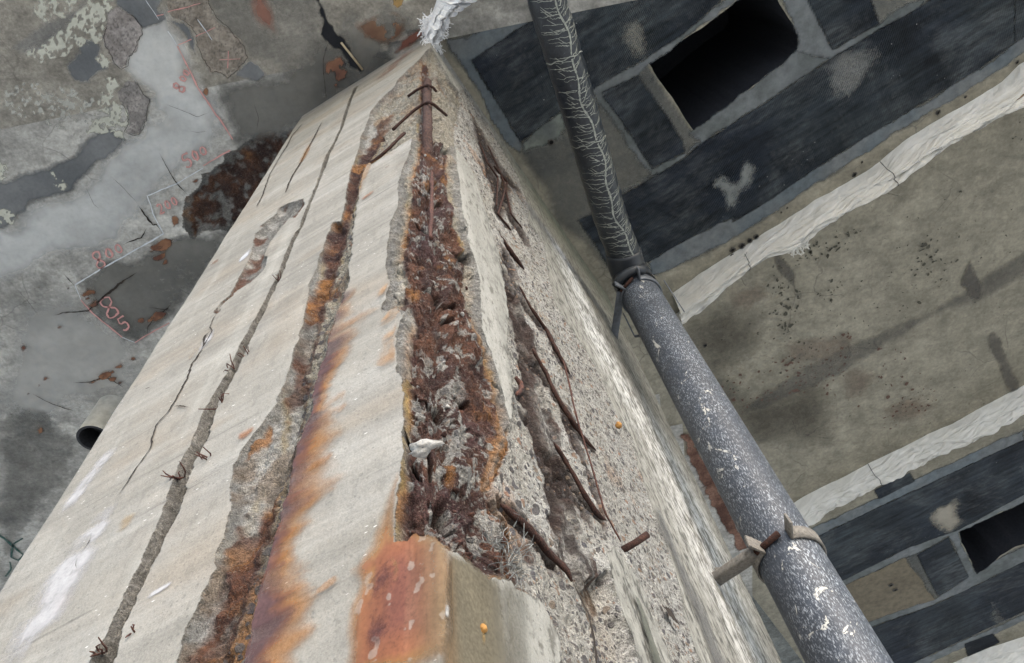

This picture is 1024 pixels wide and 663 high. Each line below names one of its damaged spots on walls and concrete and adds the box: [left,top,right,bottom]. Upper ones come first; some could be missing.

crack [21,274,134,315]
crack [89,44,358,663]
corrosion [244,294,351,663]
corrosion [352,496,451,663]
spalling [176,47,700,663]